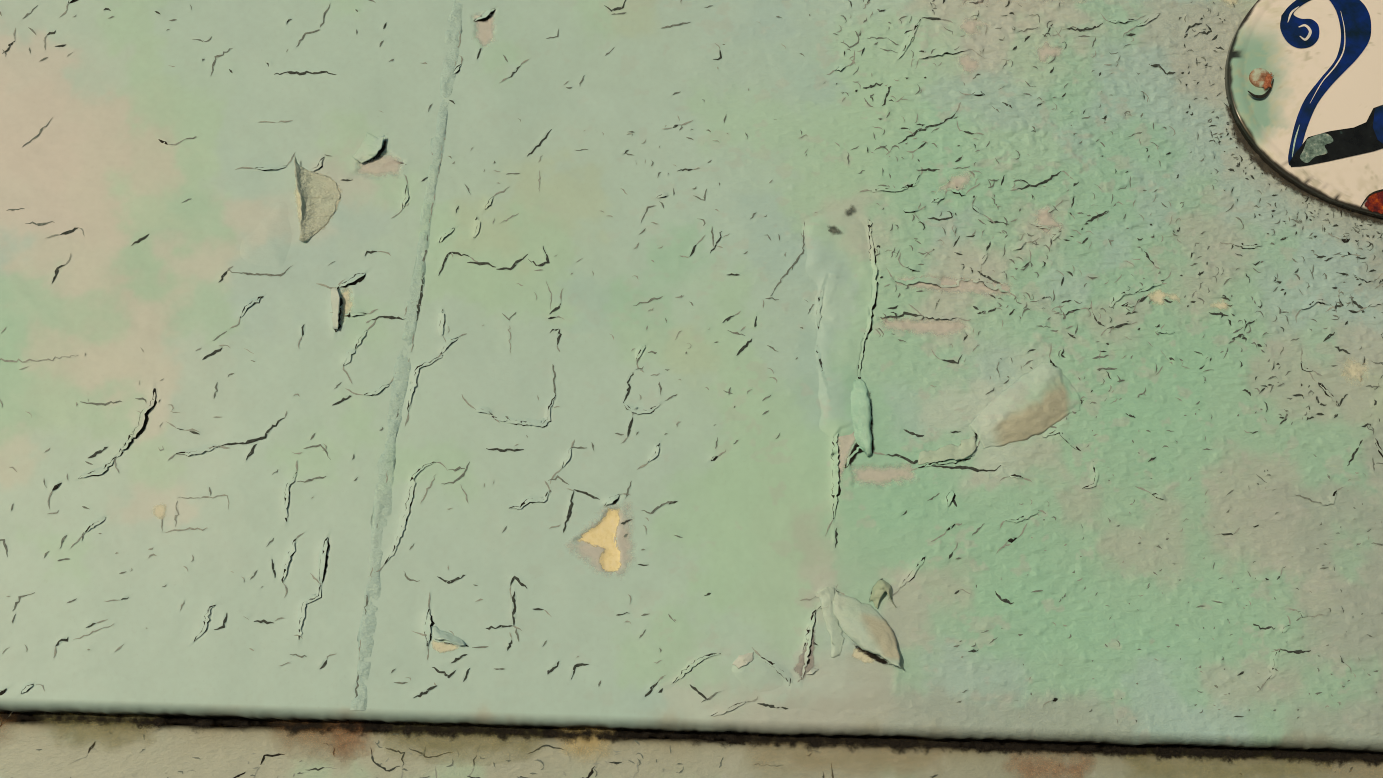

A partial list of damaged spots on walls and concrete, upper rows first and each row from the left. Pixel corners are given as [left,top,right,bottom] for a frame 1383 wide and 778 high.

peeling [352,132,399,175]
peeling [294,155,341,242]
crack [0,0,845,727]
crack [774,0,1383,723]
peeling [577,508,631,573]
peeling [817,579,902,669]
crack [36,731,145,778]
crack [719,749,837,778]